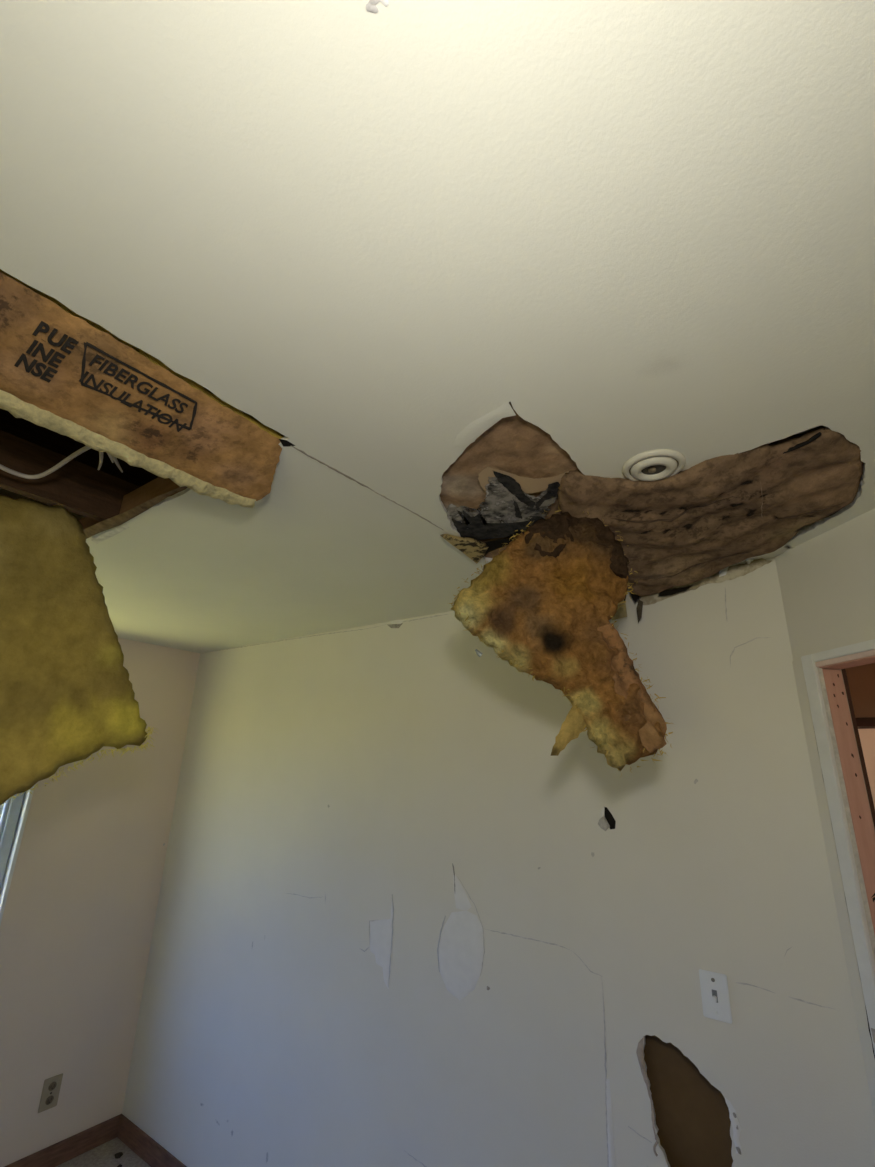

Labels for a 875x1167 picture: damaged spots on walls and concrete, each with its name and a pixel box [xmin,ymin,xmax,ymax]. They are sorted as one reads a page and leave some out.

peeling [440,402,580,564]
spalling [598,807,616,831]
crack [486,929,609,1167]
spalling [628,1038,658,1157]
spalling [725,1098,743,1155]